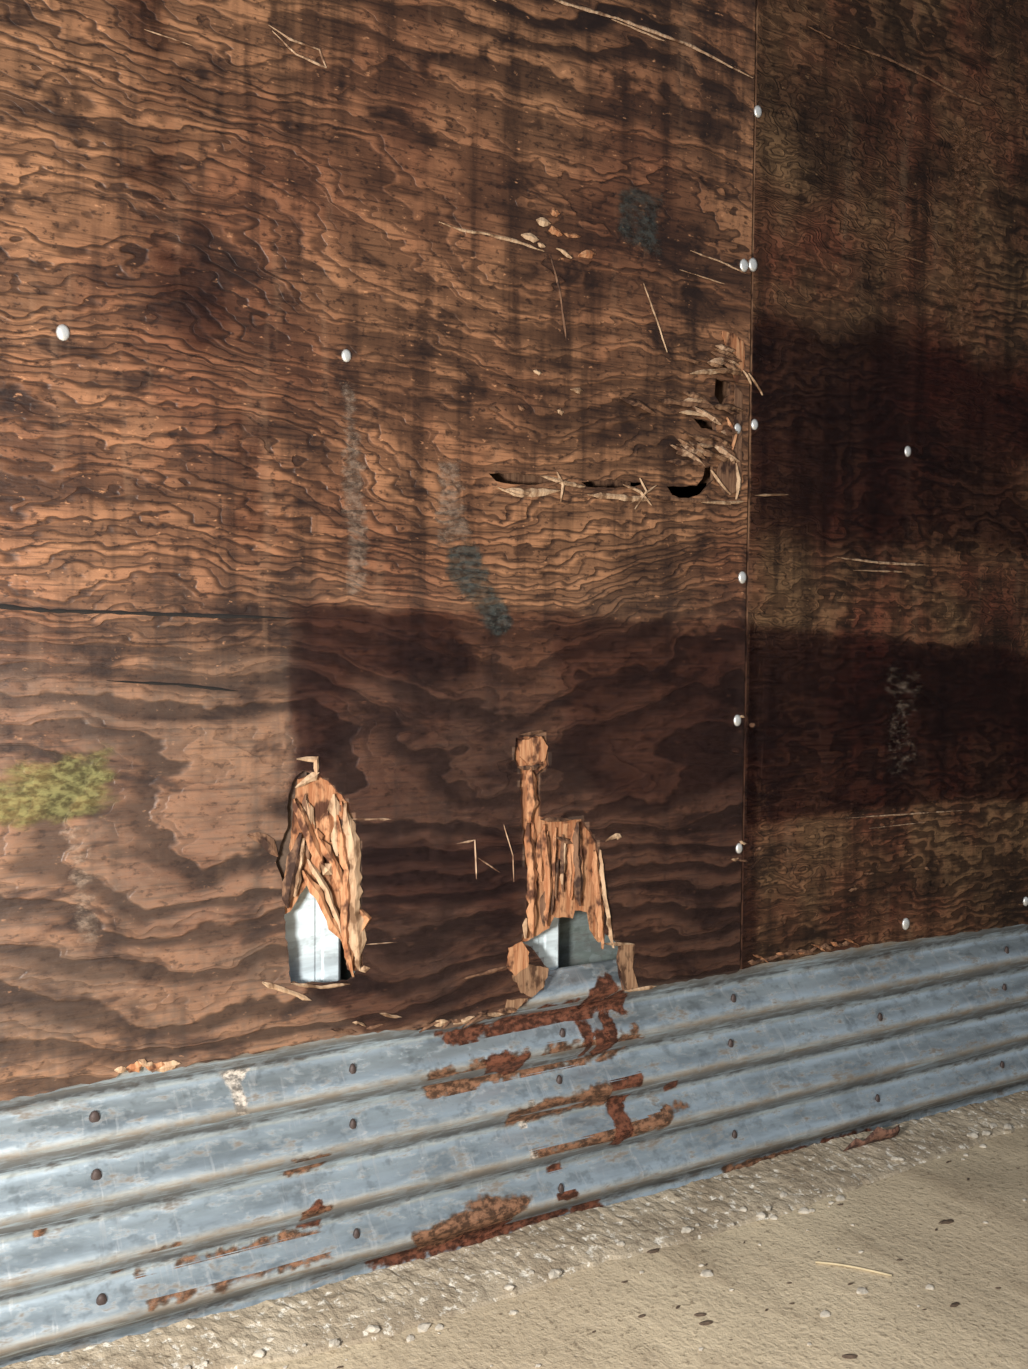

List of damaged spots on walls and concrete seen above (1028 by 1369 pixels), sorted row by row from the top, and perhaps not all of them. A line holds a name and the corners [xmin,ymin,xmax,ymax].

crack [490,472,789,509]
crack [0,604,294,619]
crack [107,680,235,691]
spalling [247,756,371,1001]
hole [462,730,656,1013]
corrosion [422,974,643,1099]
corrosion [505,1071,688,1174]
corrosion [366,1189,604,1268]